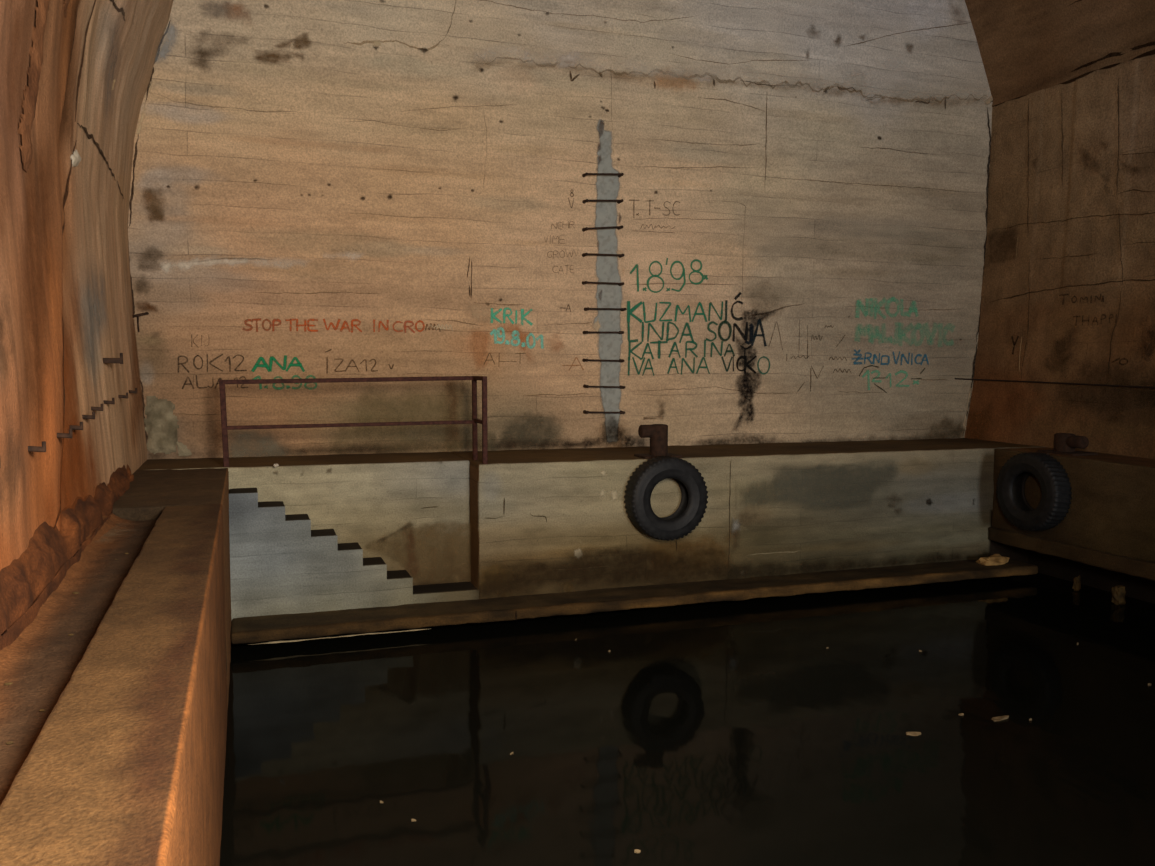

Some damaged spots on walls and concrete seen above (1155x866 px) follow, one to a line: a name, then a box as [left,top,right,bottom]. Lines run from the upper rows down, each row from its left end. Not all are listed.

crack [1069,41,1155,73]
crack [62,0,171,258]
crack [128,256,136,326]
crack [476,52,993,434]
crack [59,317,67,419]
crack [140,380,148,445]
damp [736,311,769,428]